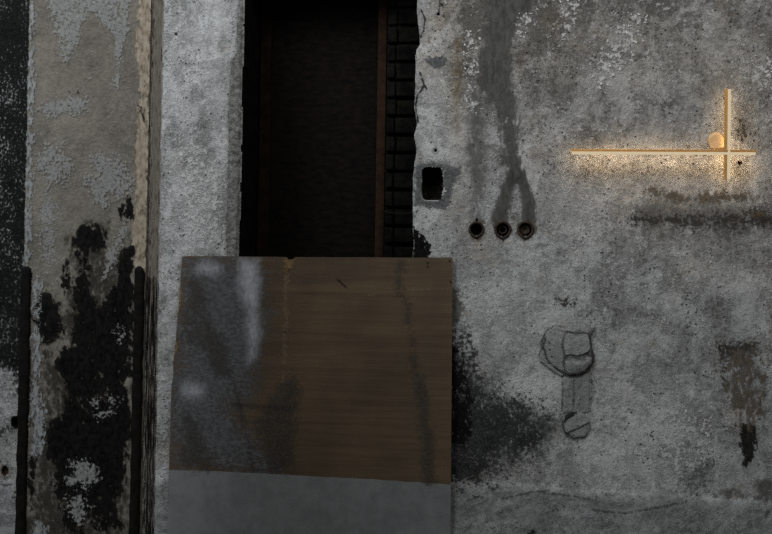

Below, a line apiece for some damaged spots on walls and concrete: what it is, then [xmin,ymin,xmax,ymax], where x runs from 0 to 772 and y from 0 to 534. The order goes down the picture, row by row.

mould [0,0,30,397]
mould [118,195,135,223]
water stain [471,0,536,225]
water stain [628,186,772,234]
mould [26,222,135,534]
water stain [451,288,557,499]